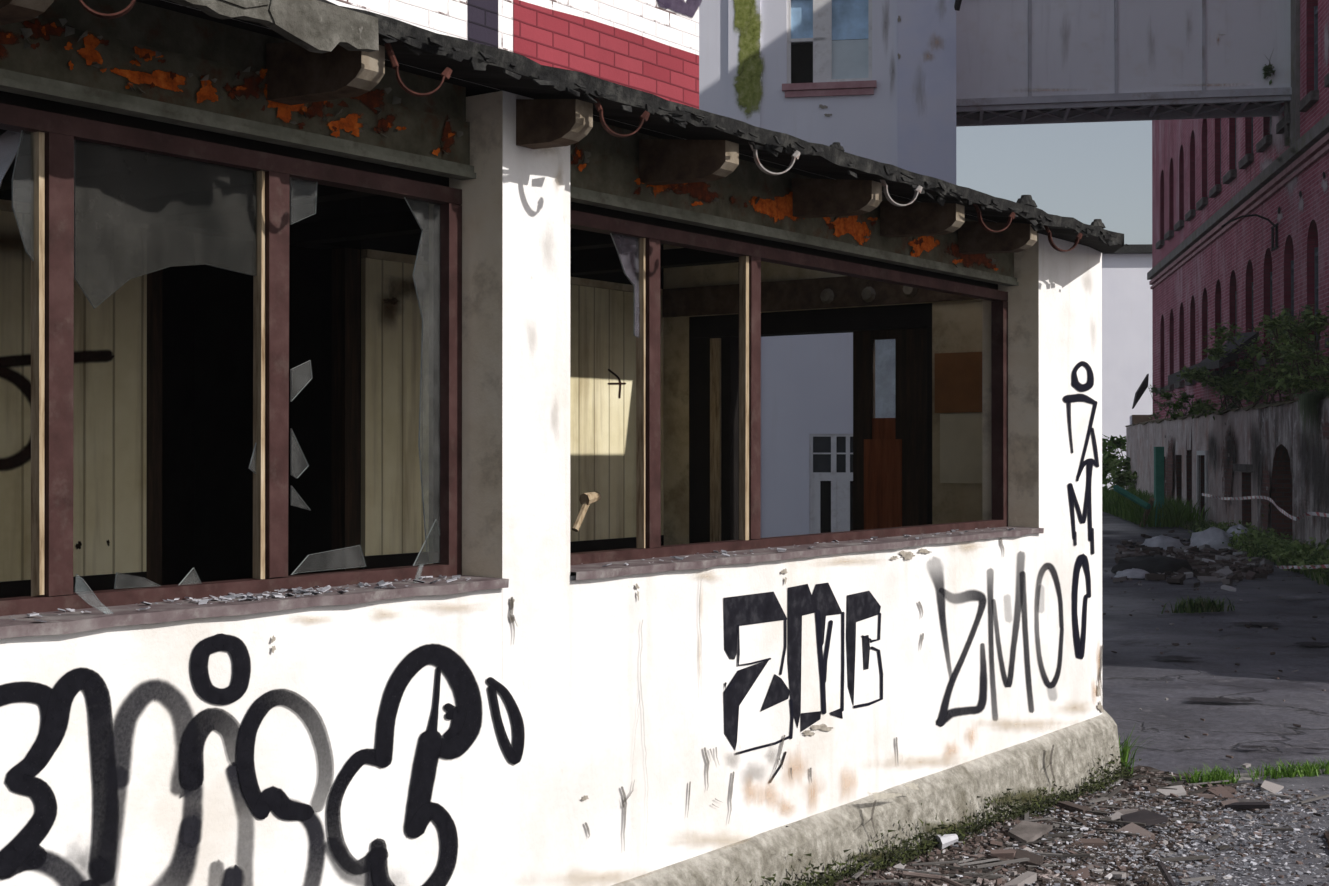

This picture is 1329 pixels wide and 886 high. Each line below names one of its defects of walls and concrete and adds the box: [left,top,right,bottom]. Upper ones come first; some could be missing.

corrosion [0,16,406,138]
corrosion [634,178,805,223]
corrosion [823,215,878,246]
corrosion [908,236,999,271]